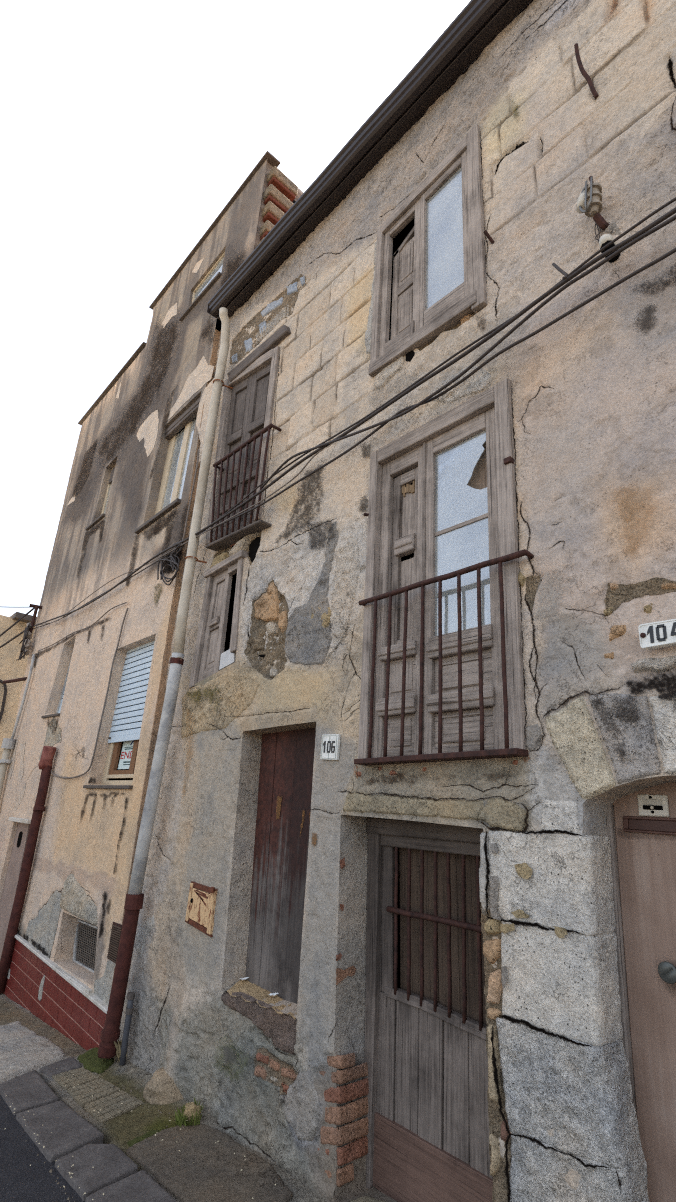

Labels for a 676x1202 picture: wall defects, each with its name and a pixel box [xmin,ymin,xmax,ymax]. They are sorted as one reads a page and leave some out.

crack [668,56,676,130]
flaking render [230,274,306,365]
flaking render [136,356,214,463]
water stain [73,441,96,496]
water stain [126,503,189,586]
water stain [307,520,335,550]
crack [511,385,625,752]
flaking render [244,580,289,680]
flaking render [603,577,676,659]
crack [341,626,361,720]
water stain [81,791,127,873]
crack [311,778,538,833]